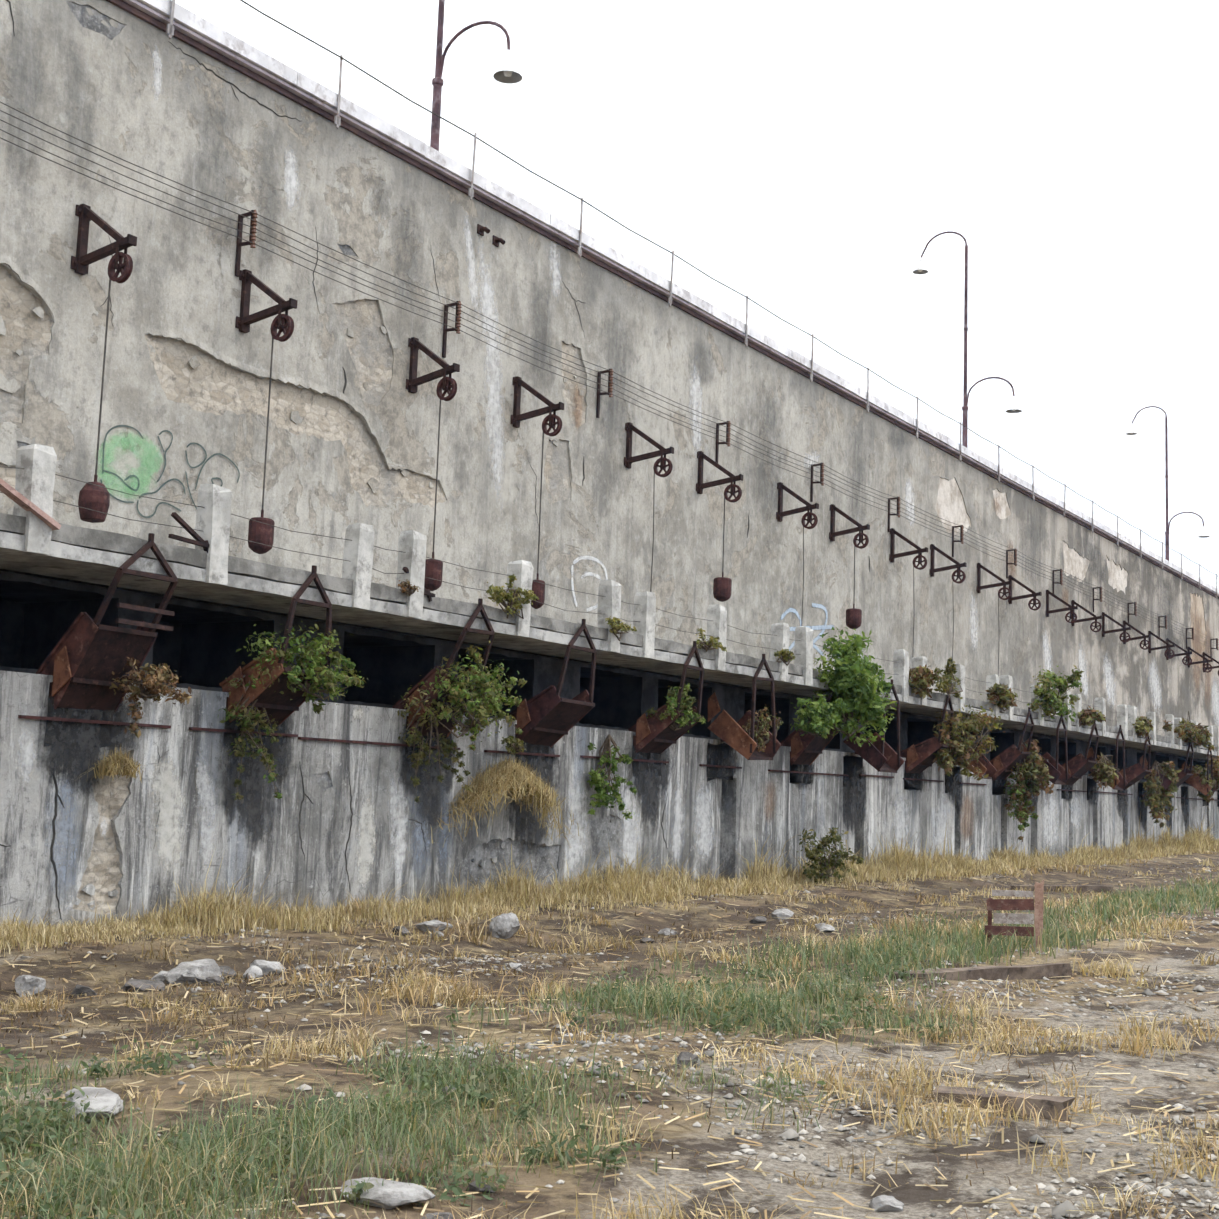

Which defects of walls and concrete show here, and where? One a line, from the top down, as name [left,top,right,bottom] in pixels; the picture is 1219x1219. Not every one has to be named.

crack [6,0,15,36]
flaking render [0,254,55,423]
flaking render [144,299,446,508]
flaking render [935,477,971,535]
flaking render [1063,541,1090,582]
flaking render [1106,556,1128,593]
crack [50,774,65,920]
leakage [22,698,137,882]
leakage [152,756,185,871]
leakage [197,718,291,861]
leakage [357,798,376,884]
leakage [508,743,587,869]